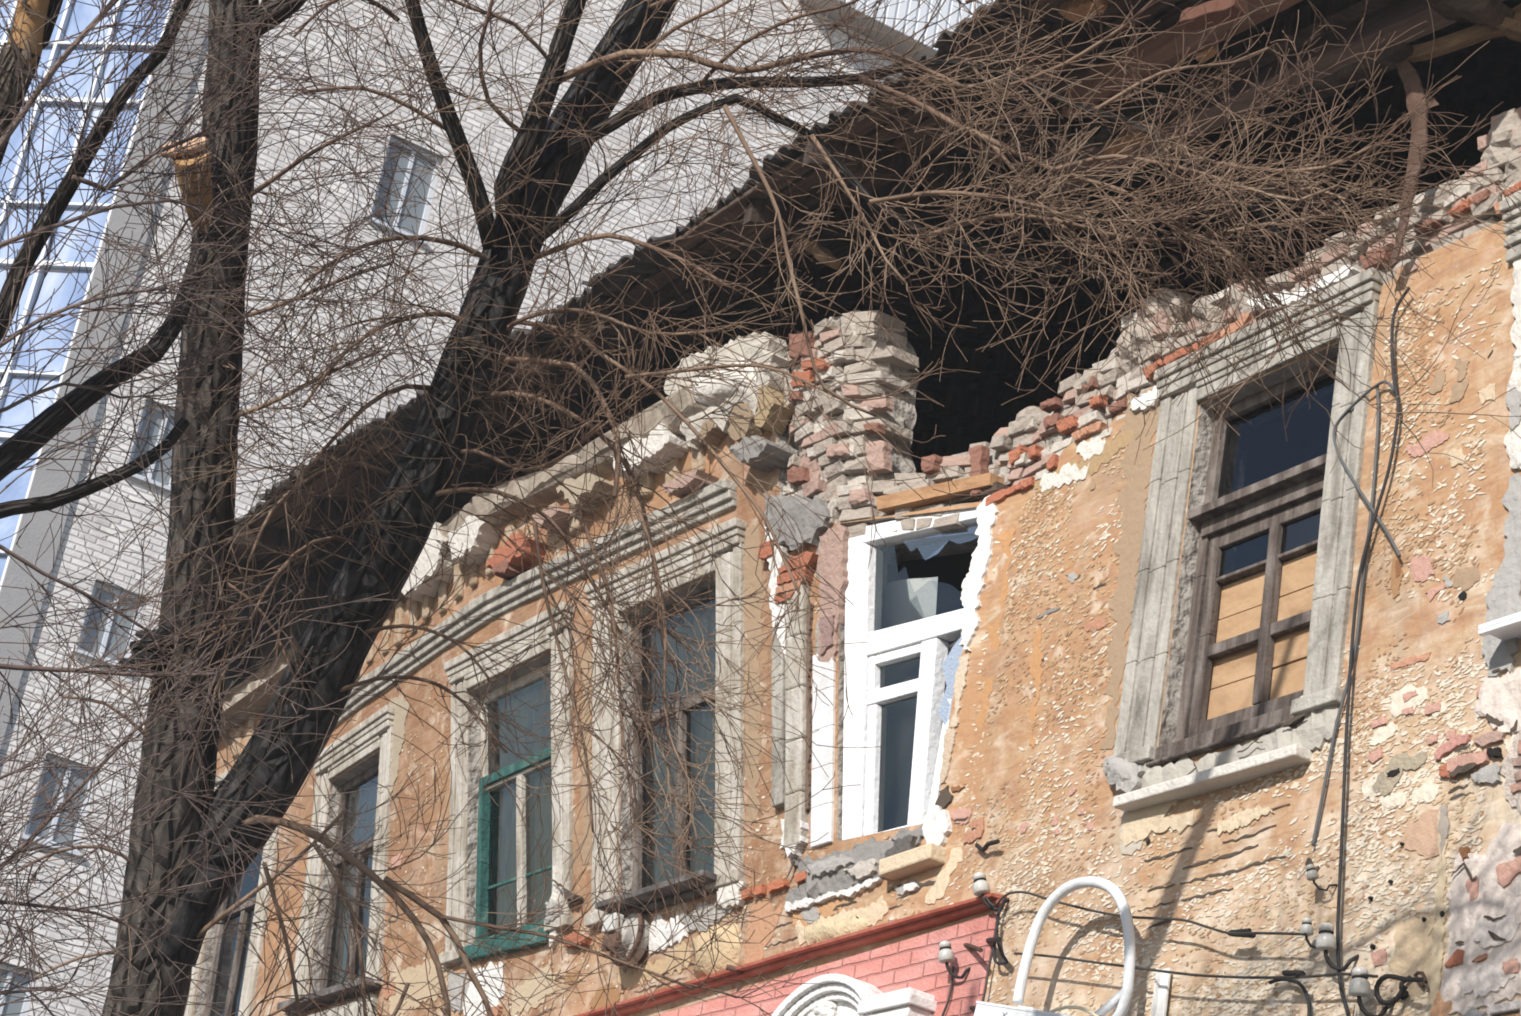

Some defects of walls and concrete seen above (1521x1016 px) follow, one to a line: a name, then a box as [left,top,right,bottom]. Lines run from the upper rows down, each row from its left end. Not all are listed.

peeling [402,505,572,602]
flaking render [611,107,1521,946]
peeling [648,915,688,954]
peeling [1362,652,1521,1016]